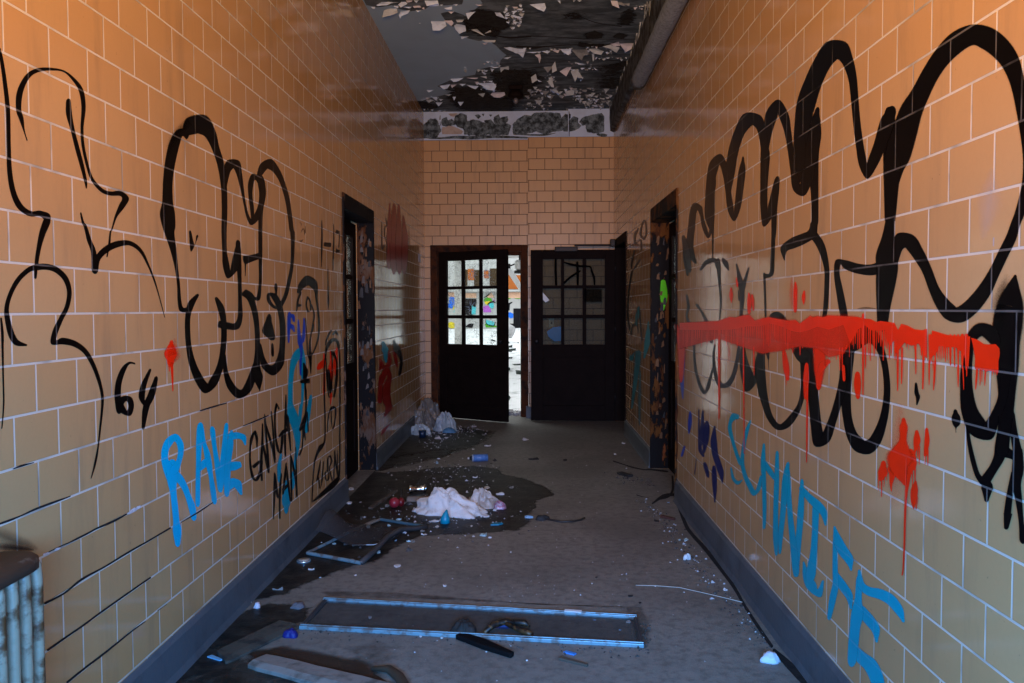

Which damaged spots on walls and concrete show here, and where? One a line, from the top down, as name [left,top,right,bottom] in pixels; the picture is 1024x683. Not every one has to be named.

spalling [364,0,653,134]
peeling [654,236,669,385]